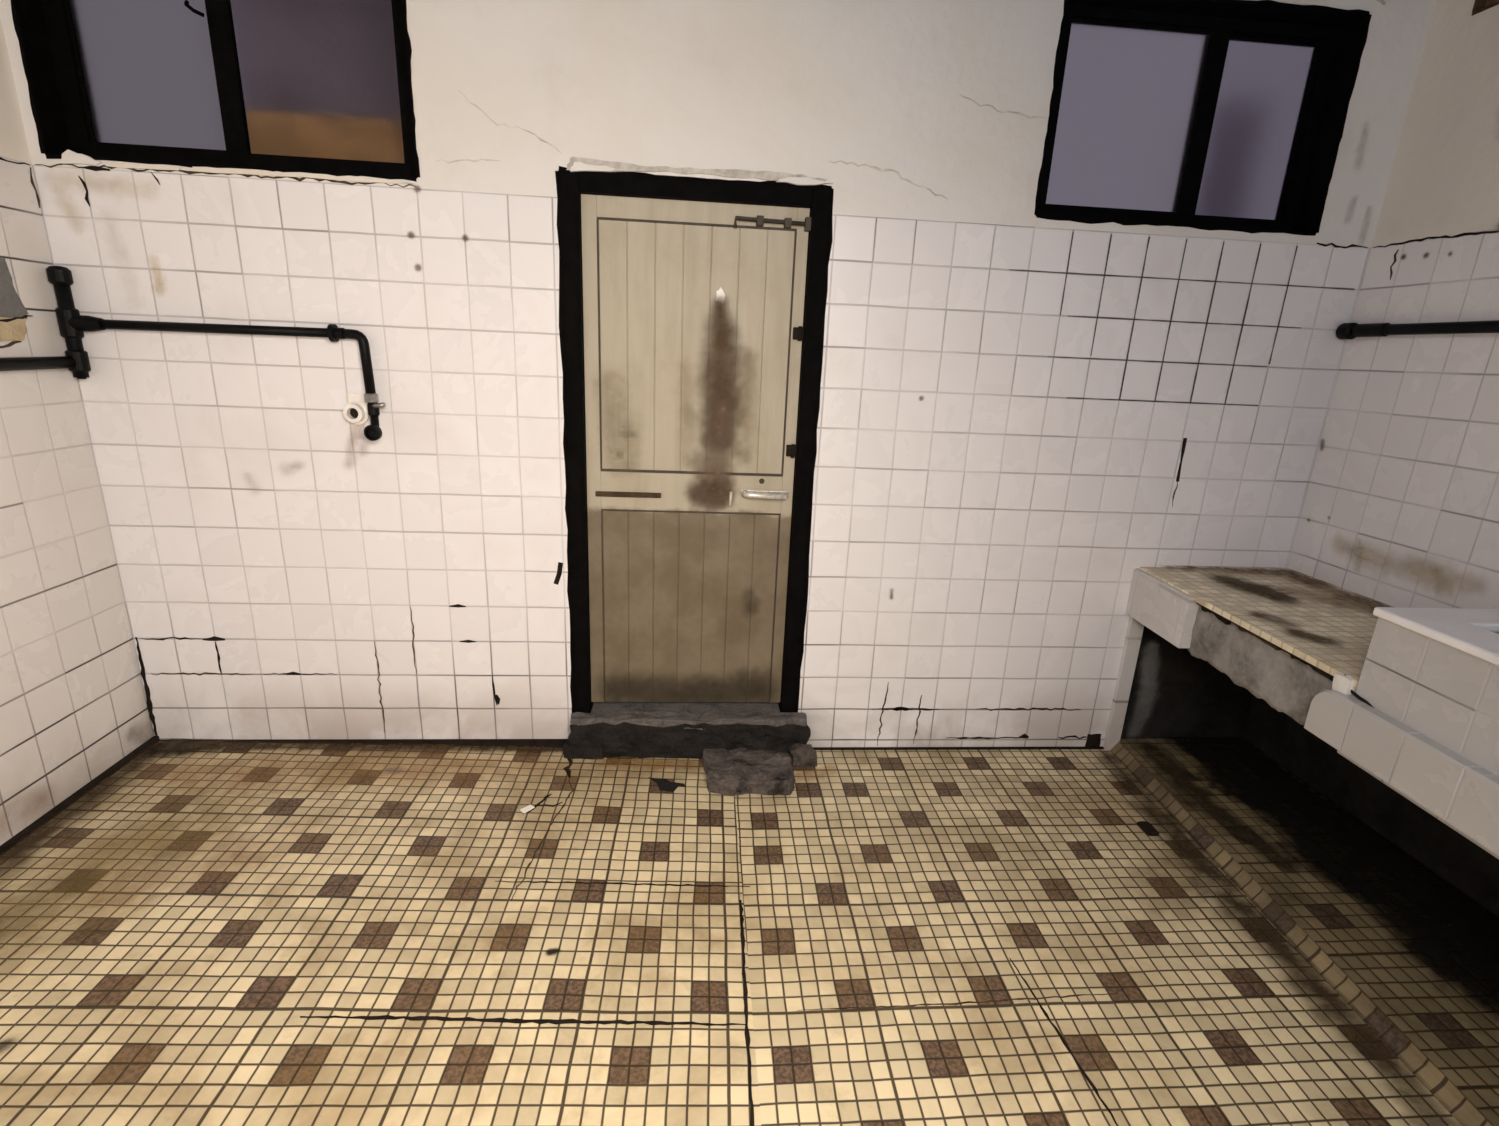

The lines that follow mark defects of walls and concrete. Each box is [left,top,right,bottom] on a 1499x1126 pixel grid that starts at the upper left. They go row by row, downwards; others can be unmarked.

peeling [0,257,32,348]
water stain [1141,743,1295,871]
crack [300,758,754,1126]